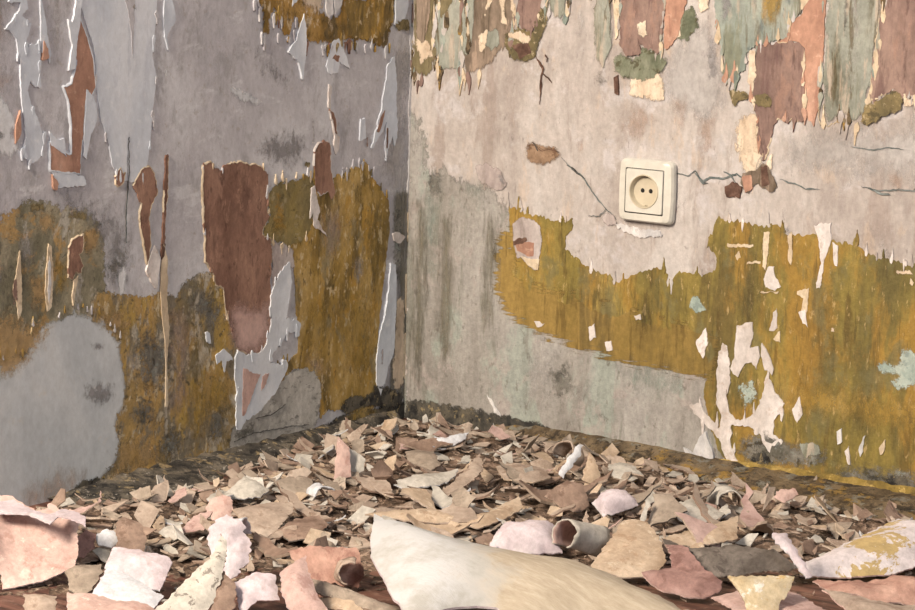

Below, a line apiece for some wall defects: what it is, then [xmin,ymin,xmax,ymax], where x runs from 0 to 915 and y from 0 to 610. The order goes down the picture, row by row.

peeling [613,0,687,82]
crack [677,170,742,184]
peeling [749,33,808,161]
crack [854,145,904,153]
crack [861,186,915,195]
peeling [865,0,915,110]
peeling [201,160,294,373]
damp [325,112,723,459]
peeling [760,232,781,294]
peeling [797,223,838,327]
flaking render [0,244,809,610]
peeling [812,575,915,610]